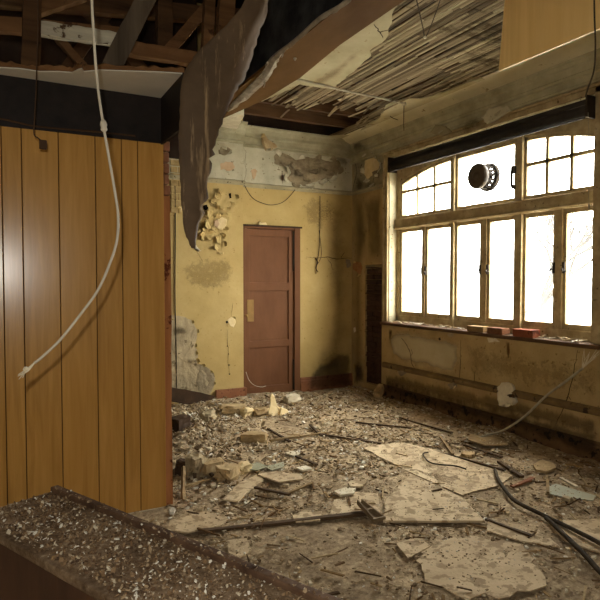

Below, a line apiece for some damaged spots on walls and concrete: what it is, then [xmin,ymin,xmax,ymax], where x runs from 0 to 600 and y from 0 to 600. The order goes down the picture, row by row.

peeling [218,146,235,173]
spalling [261,134,344,189]
peeling [360,152,381,188]
peeling [194,187,240,255]
spalling [171,315,216,394]
spalling [497,382,518,407]